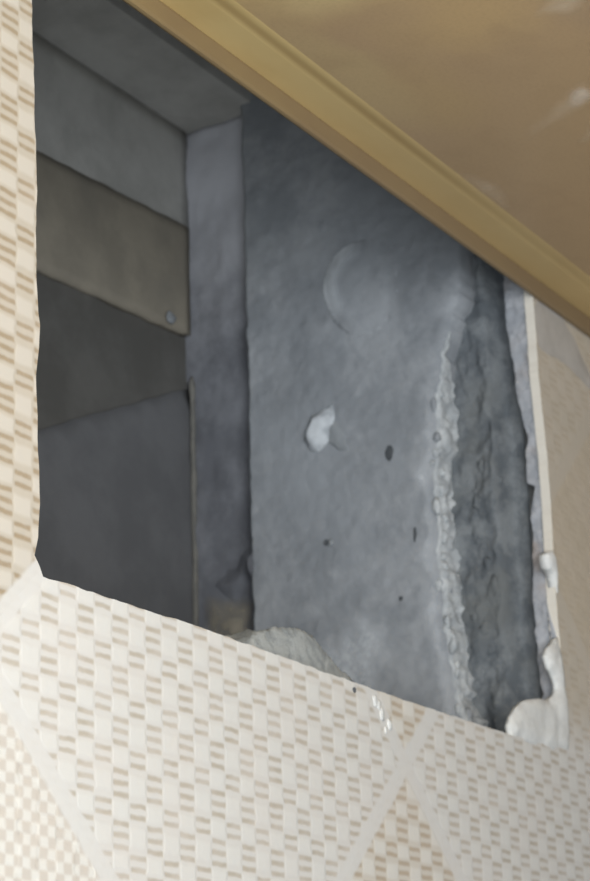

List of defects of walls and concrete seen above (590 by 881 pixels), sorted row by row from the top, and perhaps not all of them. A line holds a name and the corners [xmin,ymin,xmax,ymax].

flaking render [304,403,349,452]
spalling [385,445,393,461]
spalling [429,254,558,733]
spalling [373,694,392,734]